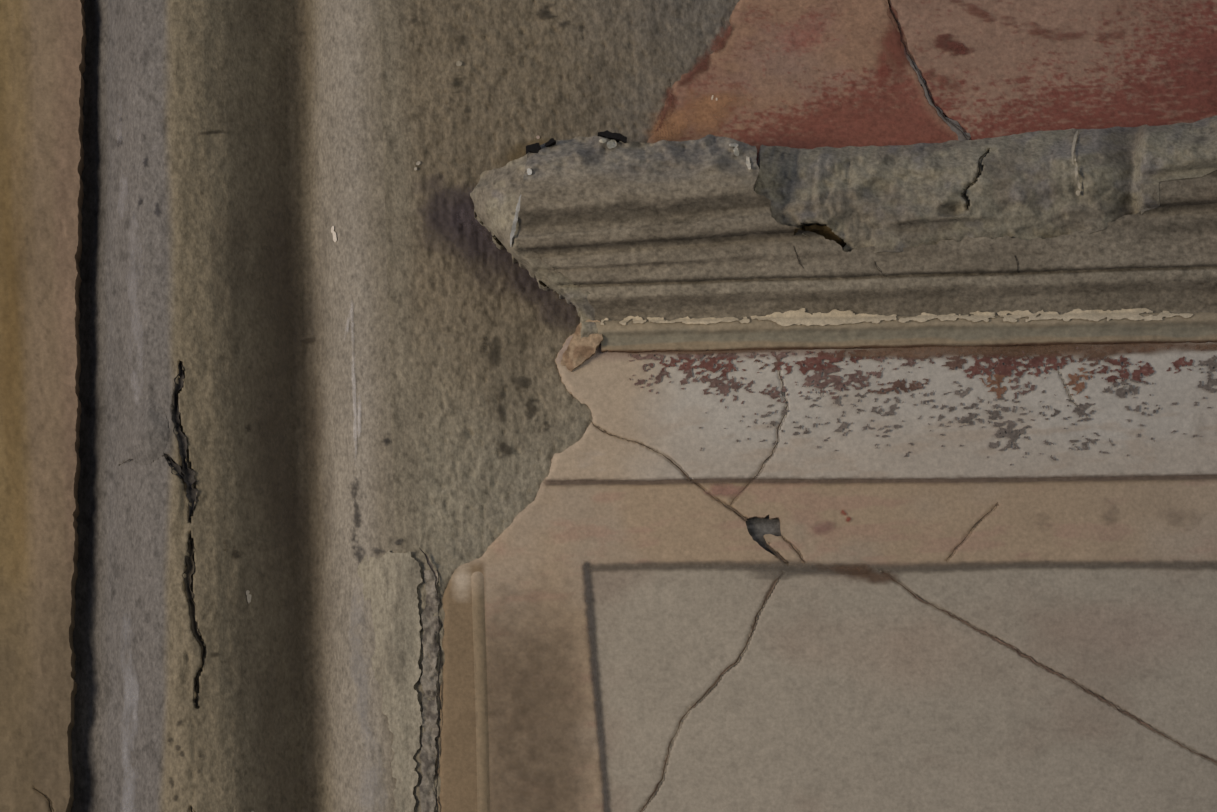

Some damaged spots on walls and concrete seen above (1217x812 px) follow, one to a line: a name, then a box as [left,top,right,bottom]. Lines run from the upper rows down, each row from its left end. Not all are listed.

peeling [655,26,732,130]
spalling [470,154,1193,372]
crack [886,0,987,210]
peeling [935,34,967,55]
spalling [754,115,1217,253]
crack [162,361,205,709]
crack [590,372,788,521]
peeling [628,344,1217,466]
flaking render [352,486,440,812]
crack [640,537,804,812]
crack [882,572,1217,764]